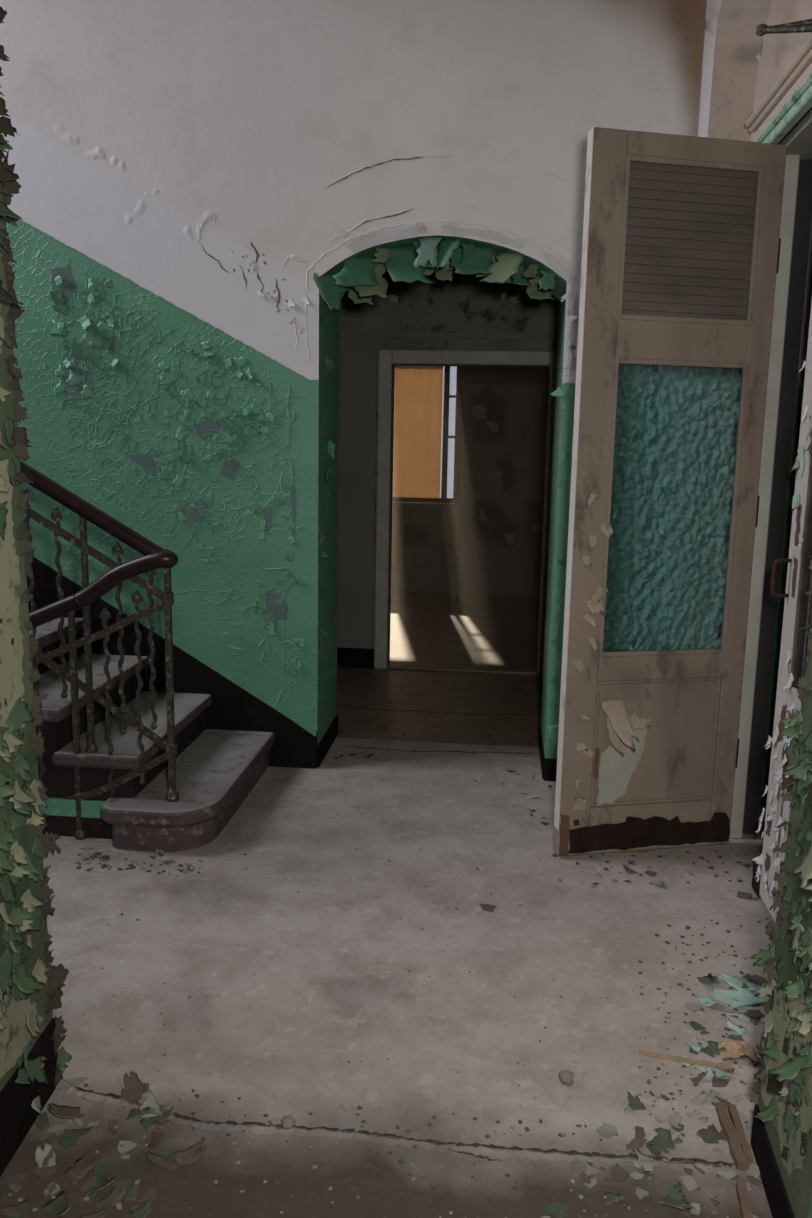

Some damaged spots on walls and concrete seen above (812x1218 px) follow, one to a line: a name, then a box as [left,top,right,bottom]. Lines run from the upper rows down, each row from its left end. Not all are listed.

crack [325,155,475,188]
peeling [187,341,261,386]
peeling [285,220,578,398]
peeling [788,399,812,608]
peeling [0,45,174,1218]
peeling [735,631,812,1176]